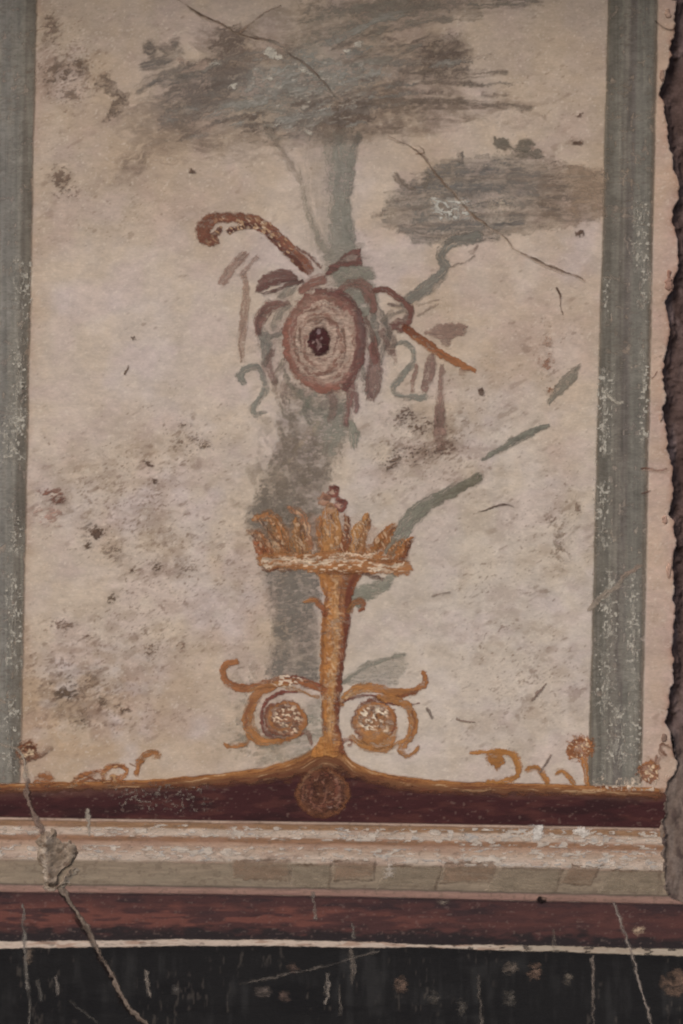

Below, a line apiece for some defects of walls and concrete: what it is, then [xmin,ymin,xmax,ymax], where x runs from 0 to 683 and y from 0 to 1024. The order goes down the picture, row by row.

crack [188,6,335,96]
crack [398,141,583,313]
spalling [70,0,683,903]
crack [0,743,45,834]
crack [58,888,148,1024]